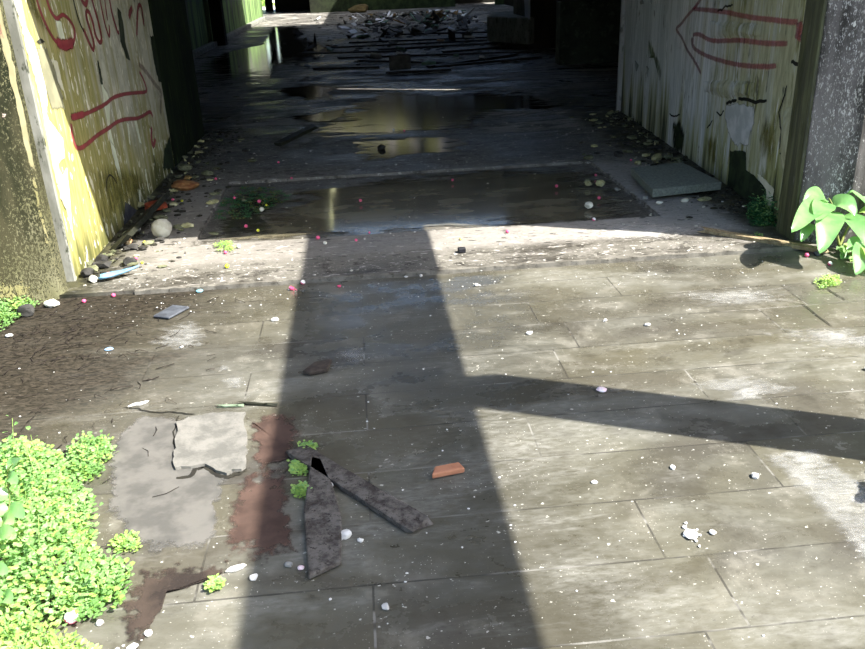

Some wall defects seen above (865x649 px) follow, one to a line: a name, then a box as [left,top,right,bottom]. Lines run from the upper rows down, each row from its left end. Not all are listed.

peeling [117,8,130,60]
spalling [150,36,161,82]
peeling [0,7,52,259]
peeling [14,0,73,233]
spalling [163,137,174,170]
spalling [725,103,774,207]
spalling [341,529,364,543]
spalling [225,563,258,581]